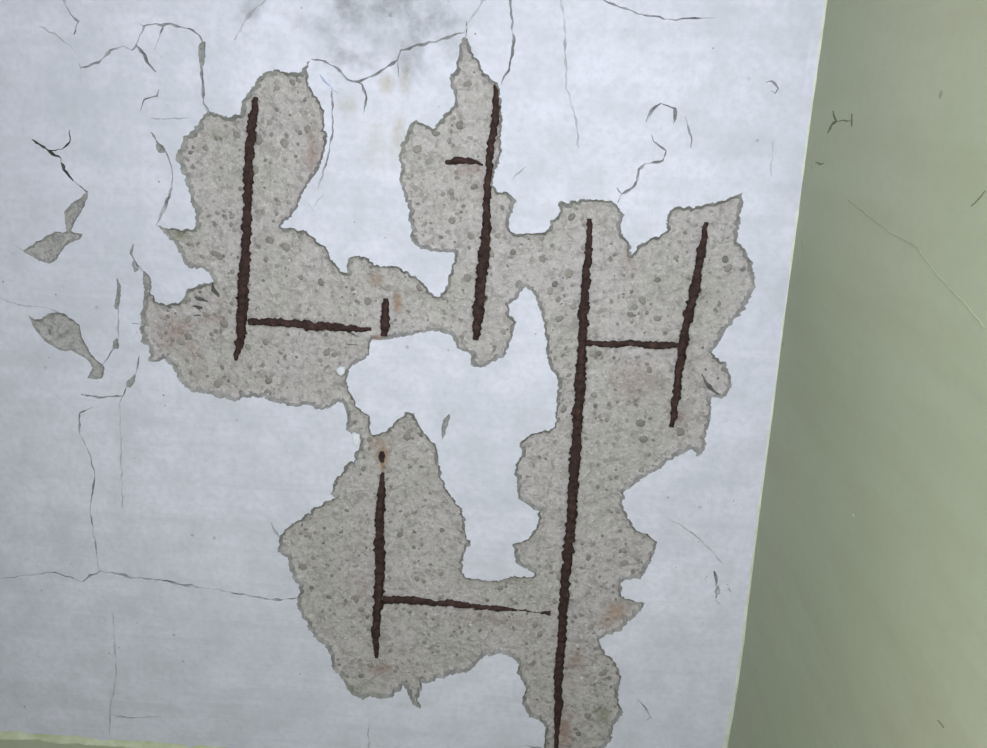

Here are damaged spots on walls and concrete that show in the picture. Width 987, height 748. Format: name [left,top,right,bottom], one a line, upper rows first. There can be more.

crack [32,0,210,225]
crack [304,0,485,211]
crack [501,0,516,85]
crack [560,0,580,149]
crack [617,103,693,203]
crack [603,0,716,21]
peeling [23,192,88,264]
peeling [29,312,105,379]
crack [129,244,146,275]
crack [193,283,219,316]
spalling [132,37,756,748]
crack [5,355,296,601]